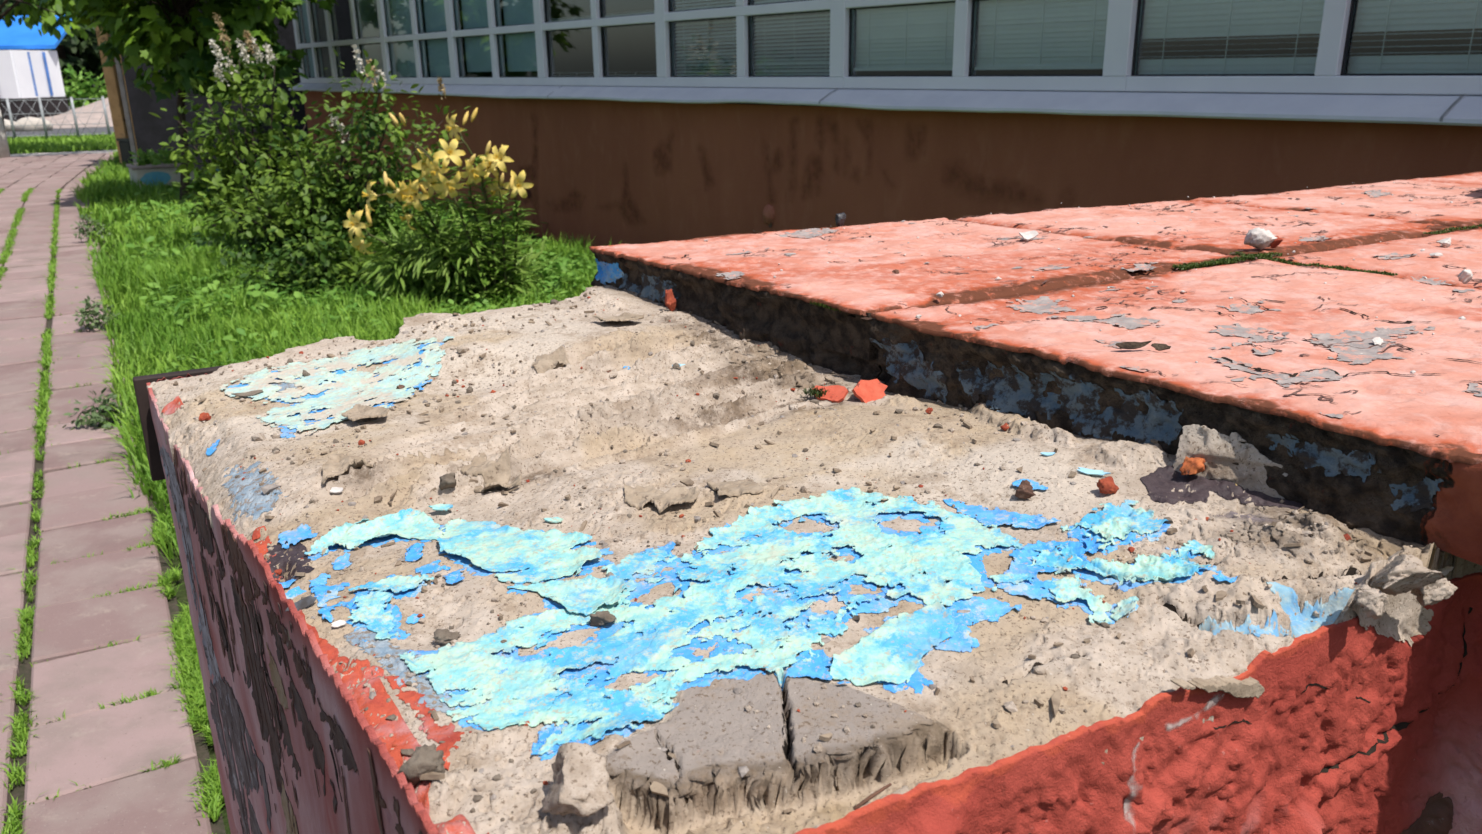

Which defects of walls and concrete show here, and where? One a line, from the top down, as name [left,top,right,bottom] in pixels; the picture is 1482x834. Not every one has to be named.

peeling [592,258,682,321]
peeling [895,207,1202,376]
peeling [219,336,454,438]
peeling [869,338,1183,445]
peeling [1205,300,1436,418]
peeling [1265,434,1443,512]
peeling [158,443,1237,834]
crack [781,686,797,783]
flaking render [1170,675,1265,698]
crack [1214,719,1252,730]
flaking render [1198,554,1458,647]
crack [1302,607,1473,773]